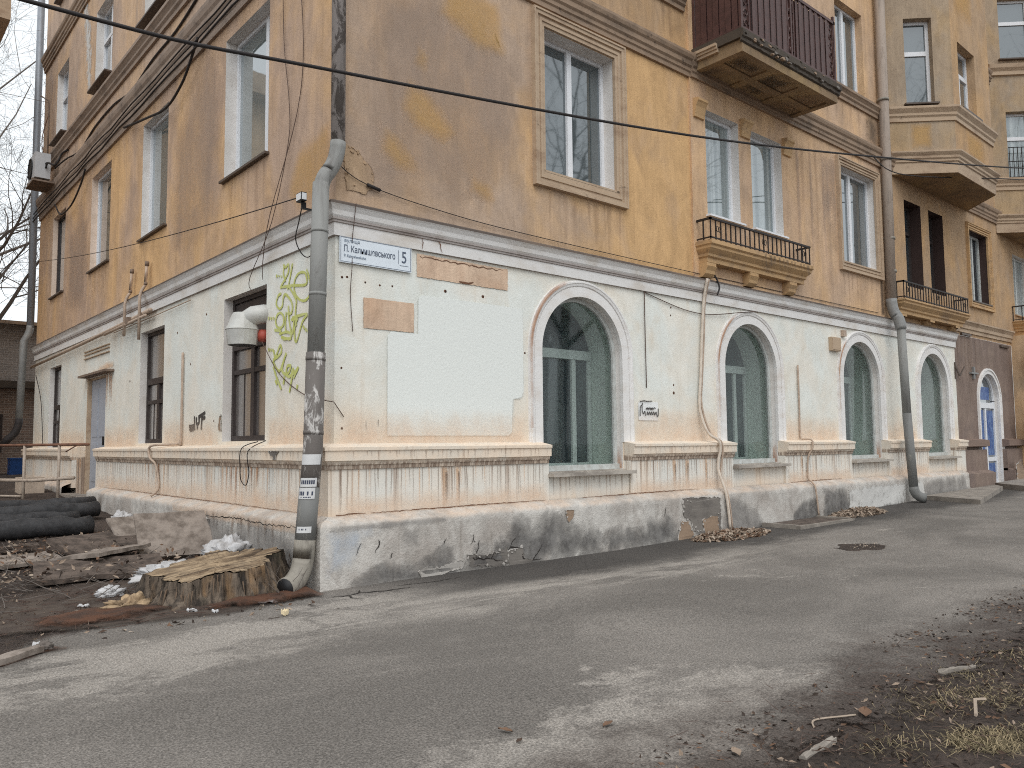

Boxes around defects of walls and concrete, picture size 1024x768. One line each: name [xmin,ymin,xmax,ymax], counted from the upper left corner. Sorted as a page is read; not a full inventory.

peeling [343,144,374,194]
spalling [678,496,722,540]
damp [361,551,451,586]
crack [334,534,542,599]
damp [469,518,678,570]